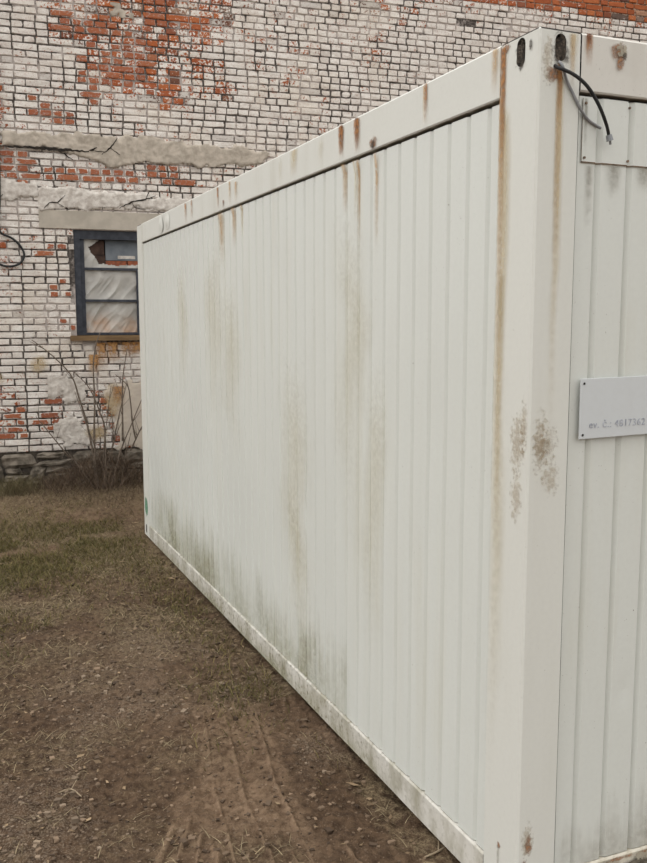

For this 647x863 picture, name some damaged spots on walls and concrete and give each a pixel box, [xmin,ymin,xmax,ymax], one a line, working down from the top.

peeling [51,0,167,104]
corrosion [612,43,627,69]
corrosion [549,34,575,137]
peeling [28,95,74,124]
crack [0,139,120,160]
peeling [0,150,195,186]
crack [119,193,155,209]
spalling [0,372,96,448]
spalling [100,379,143,451]
peeling [630,850,647,863]